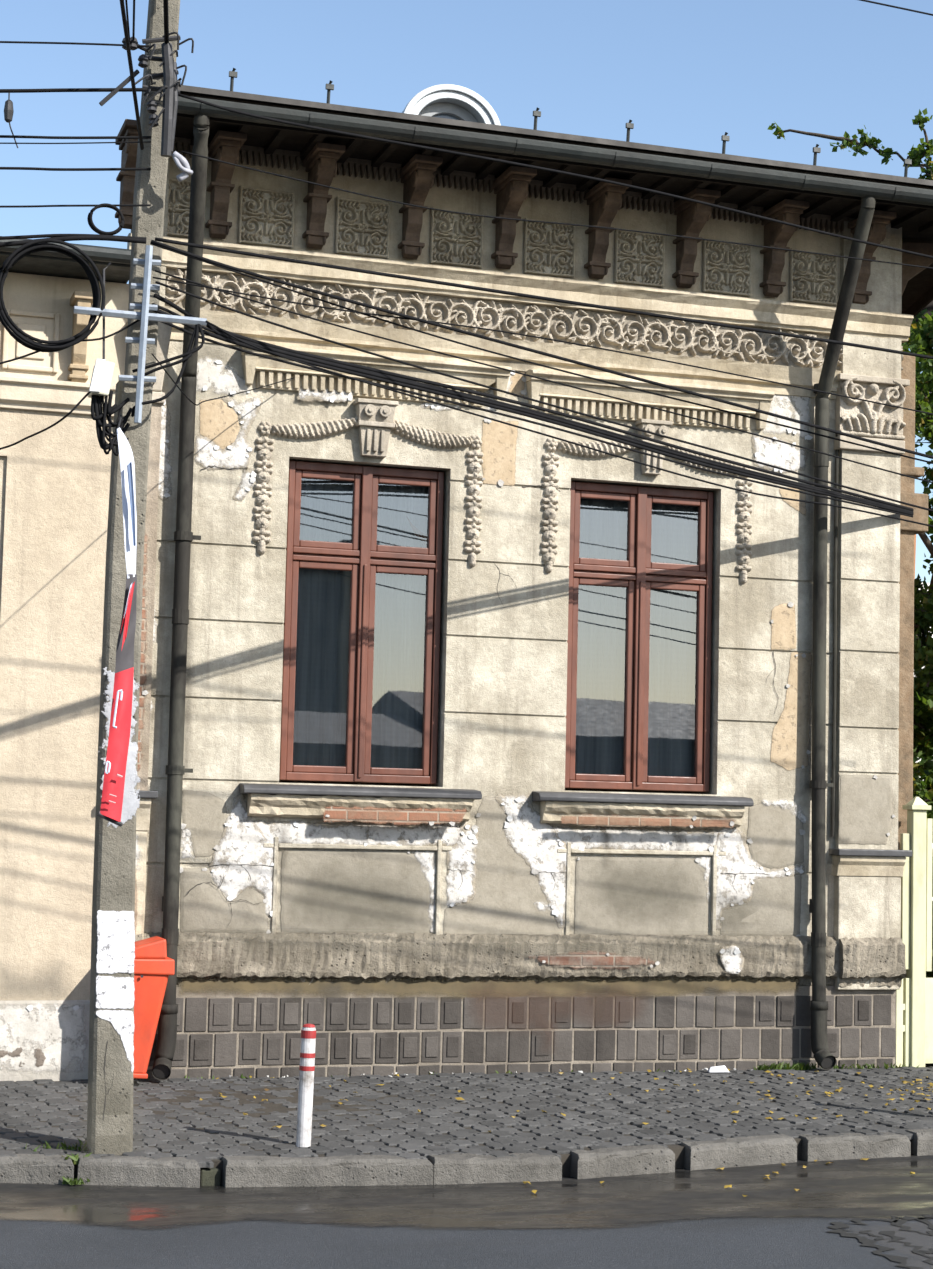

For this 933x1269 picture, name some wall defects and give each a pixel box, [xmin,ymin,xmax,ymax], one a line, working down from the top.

flaking render [158,401,172,500]
flaking render [194,358,263,501]
flaking render [752,394,813,474]
flaking render [779,488,806,516]
flaking render [137,535,157,771]
flaking render [181,824,192,858]
flaking render [209,794,481,932]
flaking render [495,794,806,930]
peeling [0,1003,86,1072]